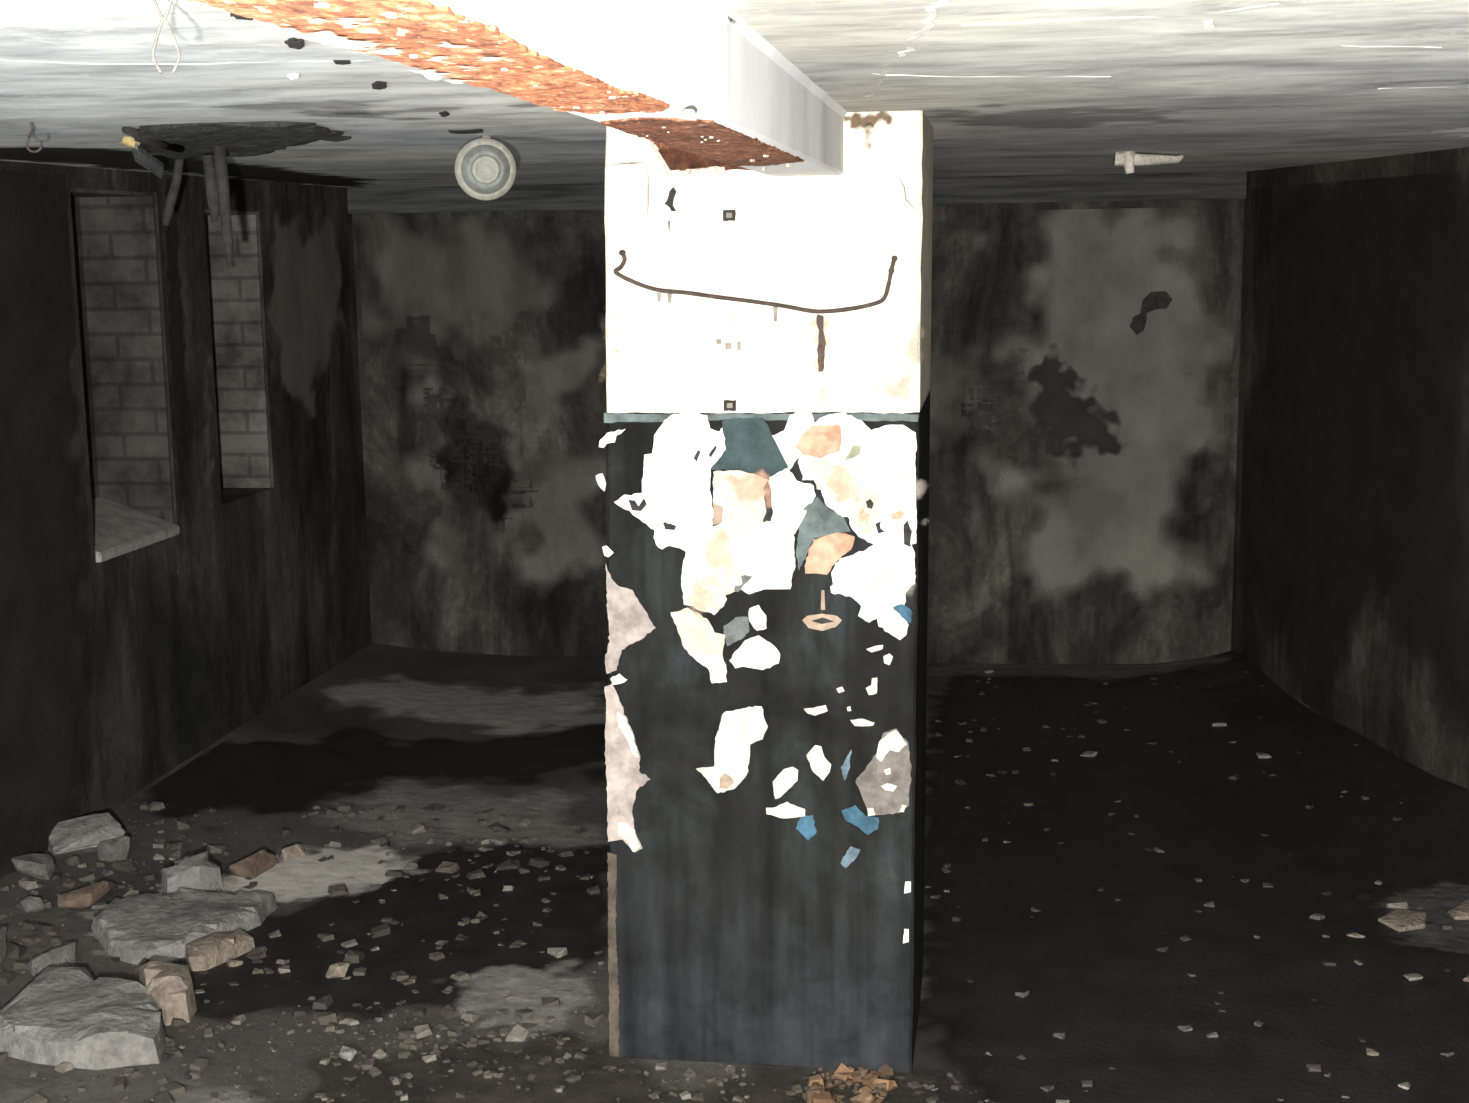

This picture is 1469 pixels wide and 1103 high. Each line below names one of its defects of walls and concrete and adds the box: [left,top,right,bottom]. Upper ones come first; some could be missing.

crack [865,0,1013,97]
peeling [596,409,917,695]
peeling [602,545,656,852]
peeling [696,706,768,793]
peeling [766,745,831,818]
peeling [804,687,912,816]